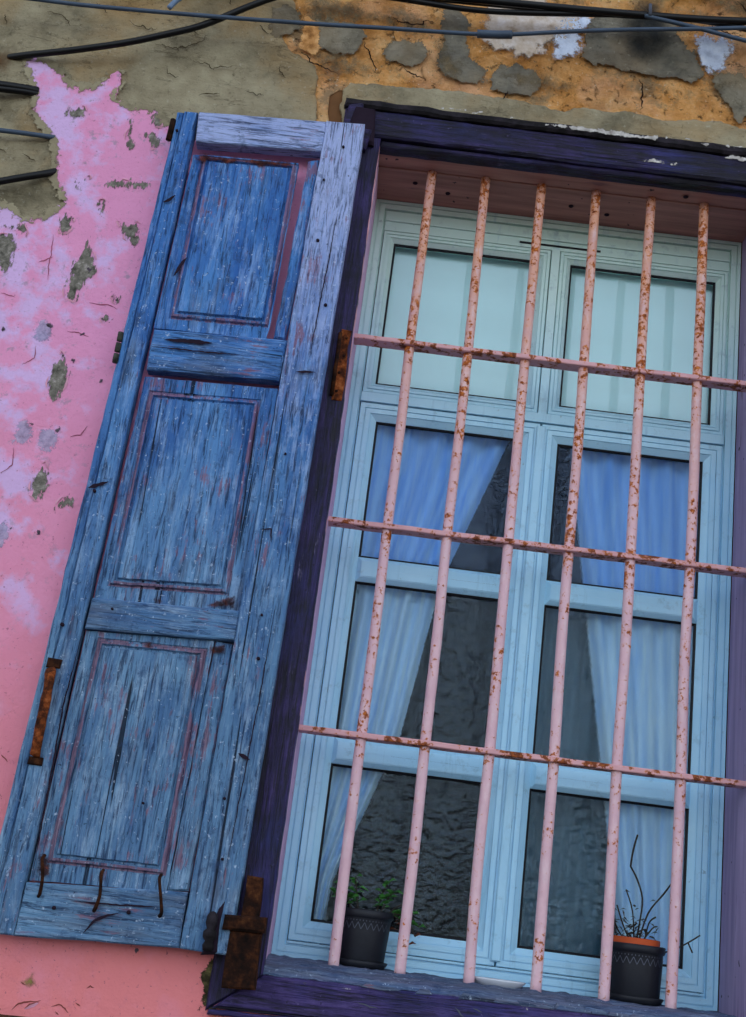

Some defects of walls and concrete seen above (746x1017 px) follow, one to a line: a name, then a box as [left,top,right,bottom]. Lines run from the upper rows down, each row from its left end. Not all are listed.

spalling [268,0,746,129]
peeling [545,124,668,140]
peeling [0,57,170,273]
peeling [62,236,97,303]
peeling [45,350,75,402]
peeling [28,460,50,502]
peeling [54,496,74,510]